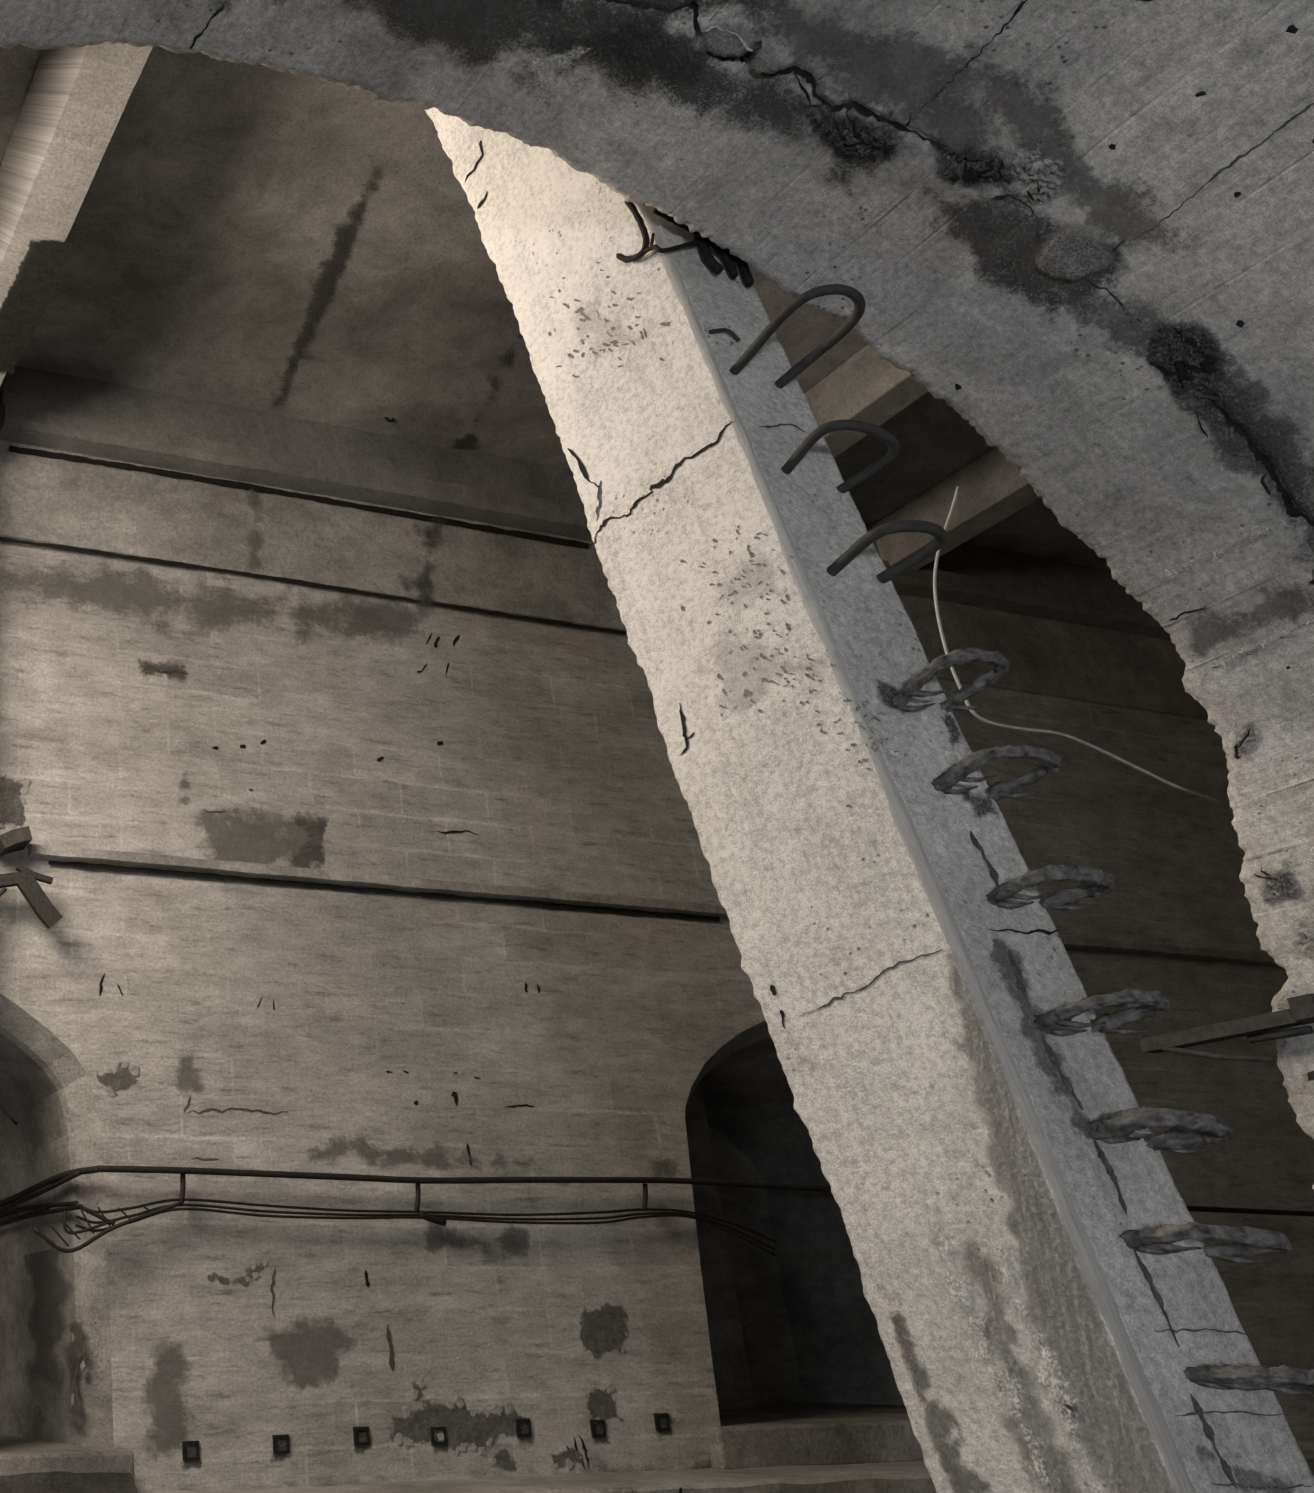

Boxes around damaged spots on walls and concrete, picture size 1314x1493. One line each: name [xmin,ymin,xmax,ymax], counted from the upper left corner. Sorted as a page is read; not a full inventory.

crack [606,0,1027,162]
damp [345,0,1314,561]
crack [568,421,805,546]
corrosion [878,681,905,714]
corrosion [944,715,960,745]
damp [200,809,326,868]
corrosion [964,791,999,817]
spalling [1254,862,1302,904]
spalling [1293,917,1314,958]
crack [770,948,943,1029]
damp [924,939,1172,1493]
damp [892,1314,989,1493]